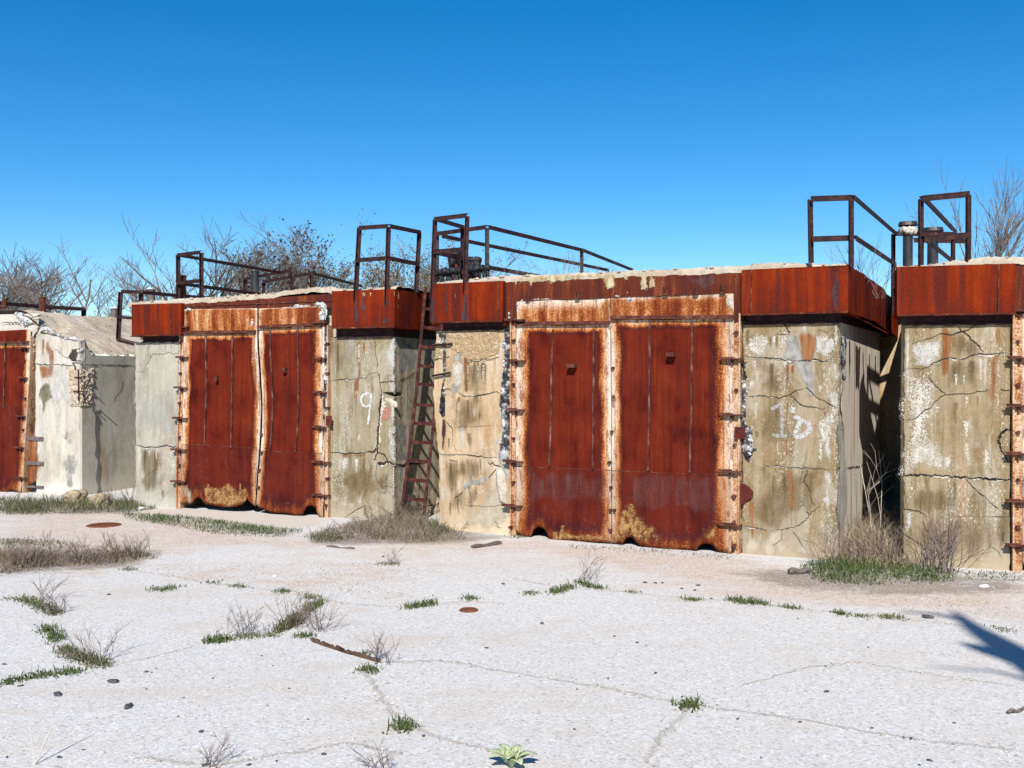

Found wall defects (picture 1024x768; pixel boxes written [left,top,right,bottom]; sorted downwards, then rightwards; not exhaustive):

rust [832,272,840,309]
peeling [14,312,94,434]
crack [331,340,501,515]
spalling [742,334,784,462]
crack [743,324,844,430]
rust [786,334,816,382]
crack [905,325,1012,420]
leakage [953,324,996,385]
rust [204,484,248,507]
rust [553,504,659,542]
crack [741,463,865,546]
crack [902,428,1011,557]